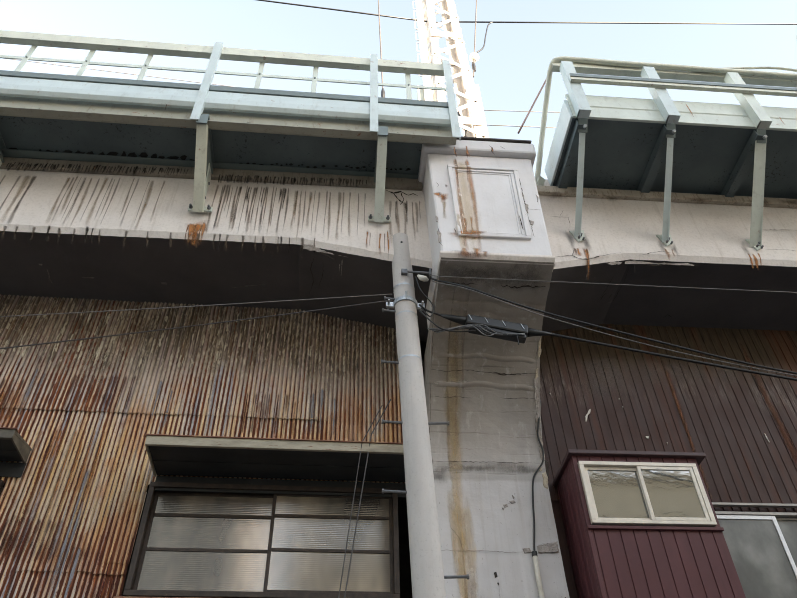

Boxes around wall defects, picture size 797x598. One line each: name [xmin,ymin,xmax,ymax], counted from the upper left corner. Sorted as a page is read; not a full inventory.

damp [0,162,188,217]
damp [208,175,367,226]
crack [387,190,418,212]
rust [454,146,480,238]
rust [185,223,206,244]
rust [67,375,136,407]
crack [429,315,537,433]
rust [53,431,105,501]
rust [0,520,61,555]